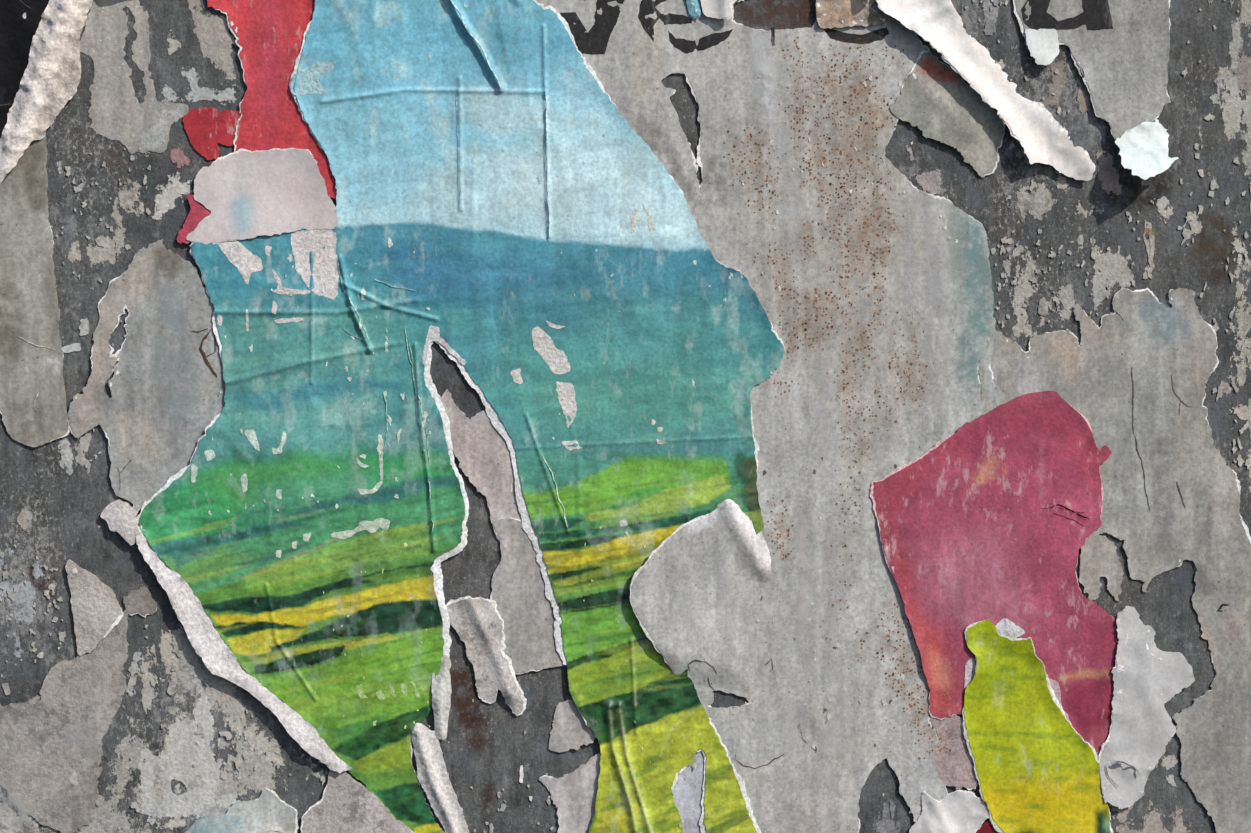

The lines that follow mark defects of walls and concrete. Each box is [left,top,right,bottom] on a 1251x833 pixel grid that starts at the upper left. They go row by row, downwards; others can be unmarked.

peeling [51,0,256,290]
peeling [217,229,356,323]
peeling [422,307,466,366]
corrosion [723,0,930,620]
peeling [991,0,1251,493]
peeling [531,321,582,451]
peeling [56,428,101,475]
peeling [356,414,402,499]
peeling [331,518,390,539]
peeling [1078,534,1124,601]
peeling [74,586,329,833]
peeling [1108,754,1191,833]